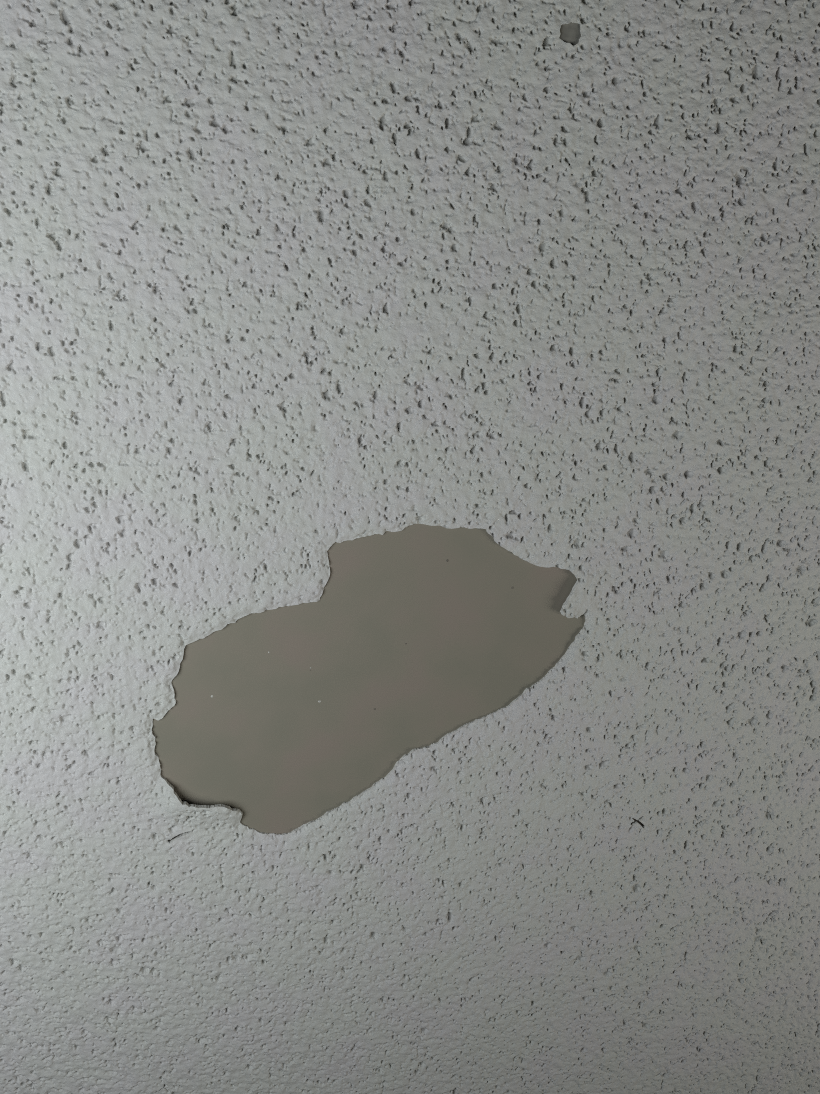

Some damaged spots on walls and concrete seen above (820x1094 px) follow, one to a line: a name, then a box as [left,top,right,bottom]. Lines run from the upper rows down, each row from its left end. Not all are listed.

spalling [559,22,582,46]
peeling [151,523,597,835]